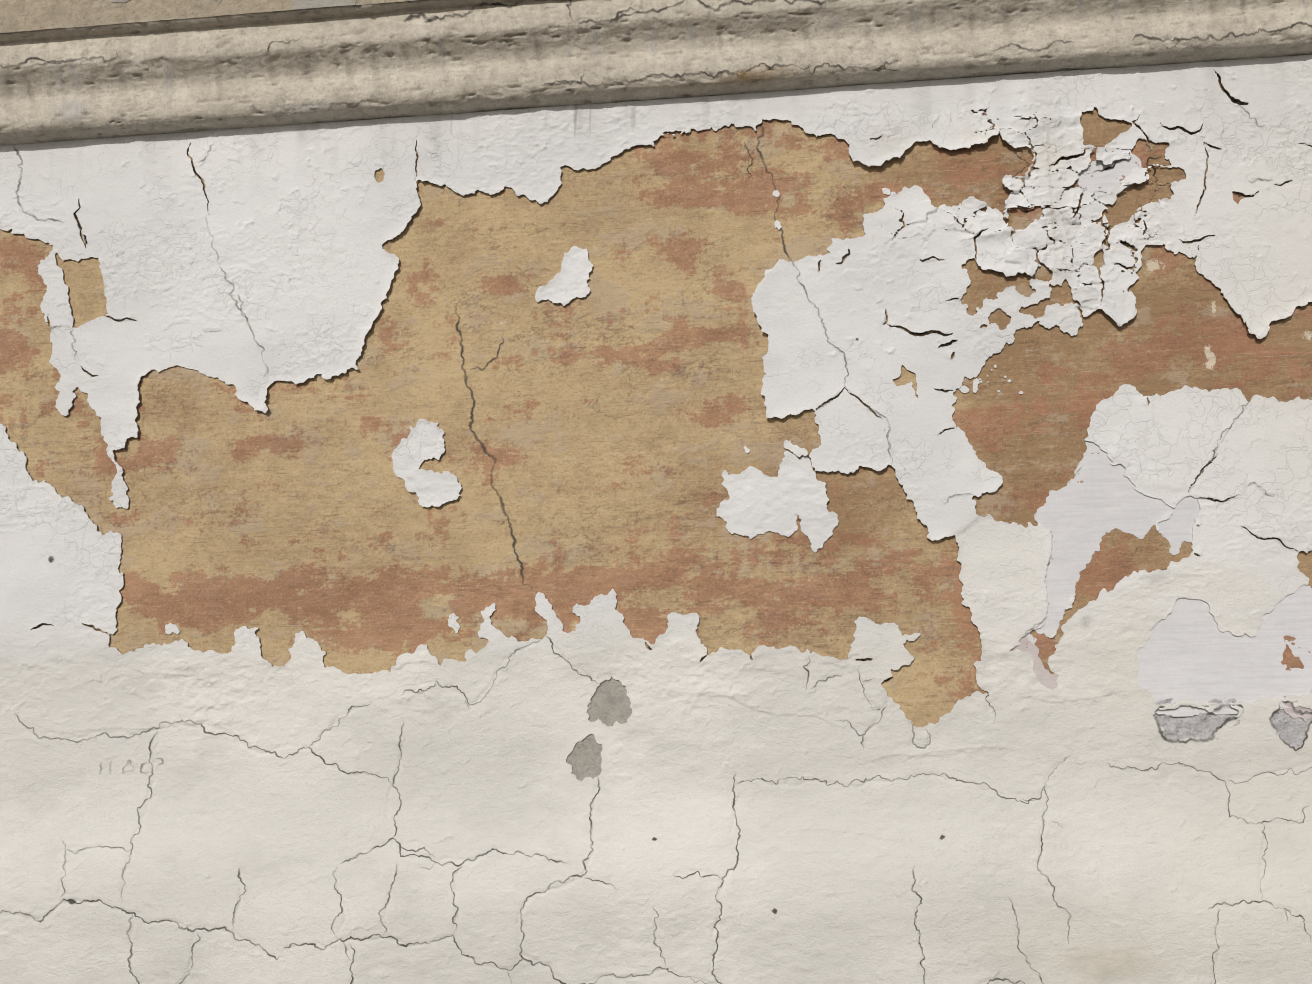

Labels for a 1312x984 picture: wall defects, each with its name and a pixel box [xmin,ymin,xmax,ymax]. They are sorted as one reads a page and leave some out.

peeling [0,0,299,33]
crack [568,0,825,23]
crack [630,61,896,83]
crack [1134,22,1312,49]
crack [1217,76,1250,115]
crack [455,318,504,455]
peeling [0,107,1312,751]
crack [500,498,523,577]
flaking render [566,676,632,781]
crack [803,659,891,745]
crack [23,706,1049,984]
crack [1110,762,1306,931]